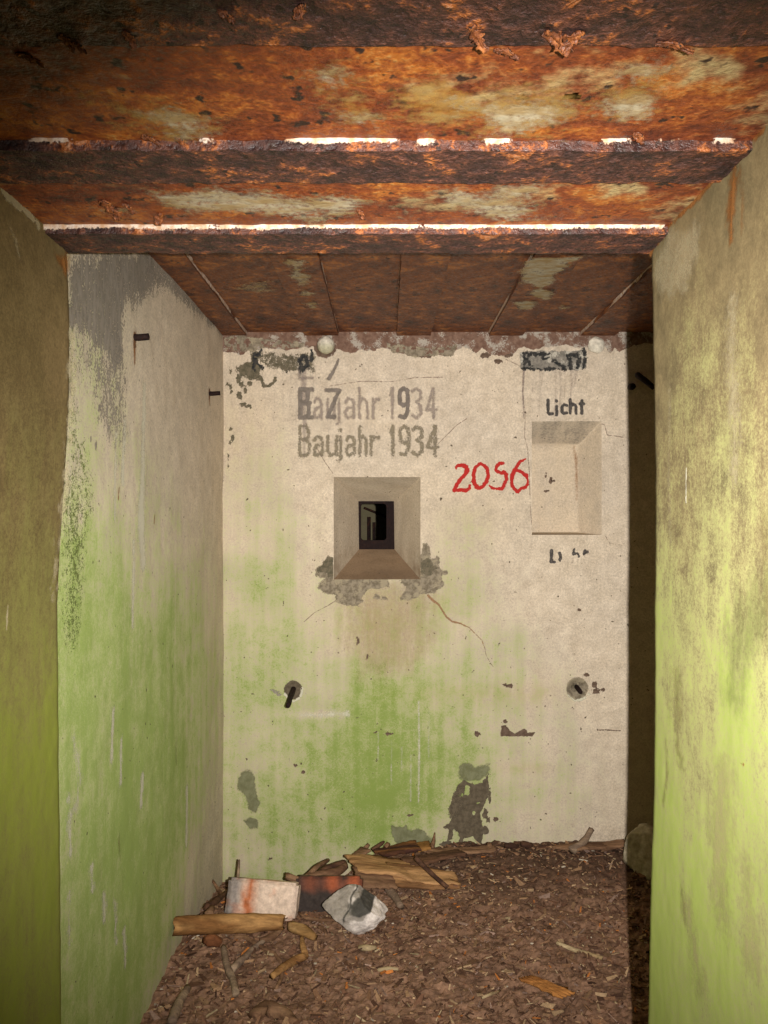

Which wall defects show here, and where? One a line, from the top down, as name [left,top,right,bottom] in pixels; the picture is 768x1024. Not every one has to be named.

corrosion [466,24,520,61]
corrosion [541,29,586,58]
corrosion [404,84,574,128]
peeling [223,332,653,364]
flaking render [315,543,448,607]
crack [427,594,492,665]
leakage [110,707,122,785]
leakage [237,770,260,829]
flaking render [391,763,491,846]